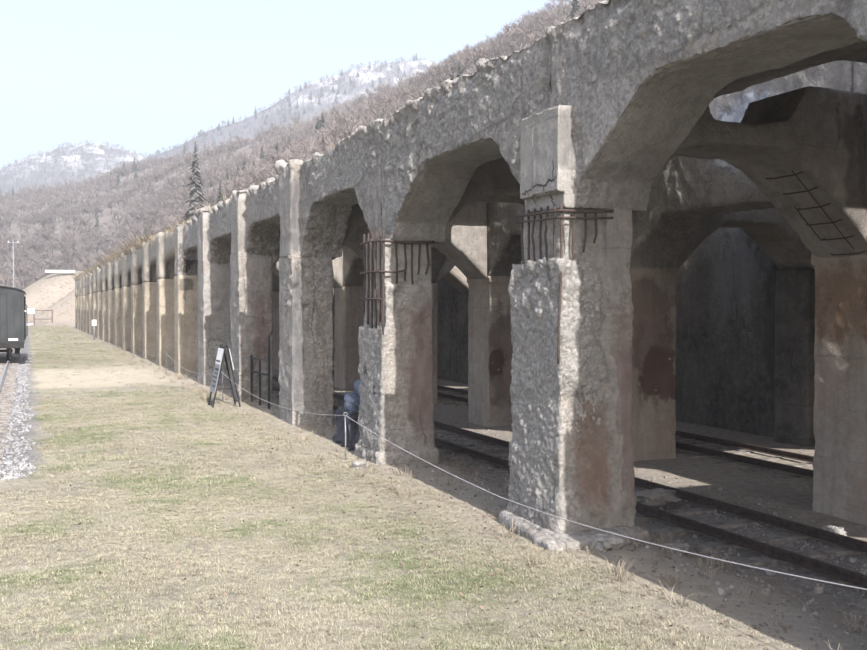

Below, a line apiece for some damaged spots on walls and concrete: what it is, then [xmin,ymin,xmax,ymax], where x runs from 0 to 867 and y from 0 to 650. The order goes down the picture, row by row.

spalling [306,55,530,452]
crack [522,160,556,205]
spalling [489,203,614,537]
spalling [765,170,867,256]